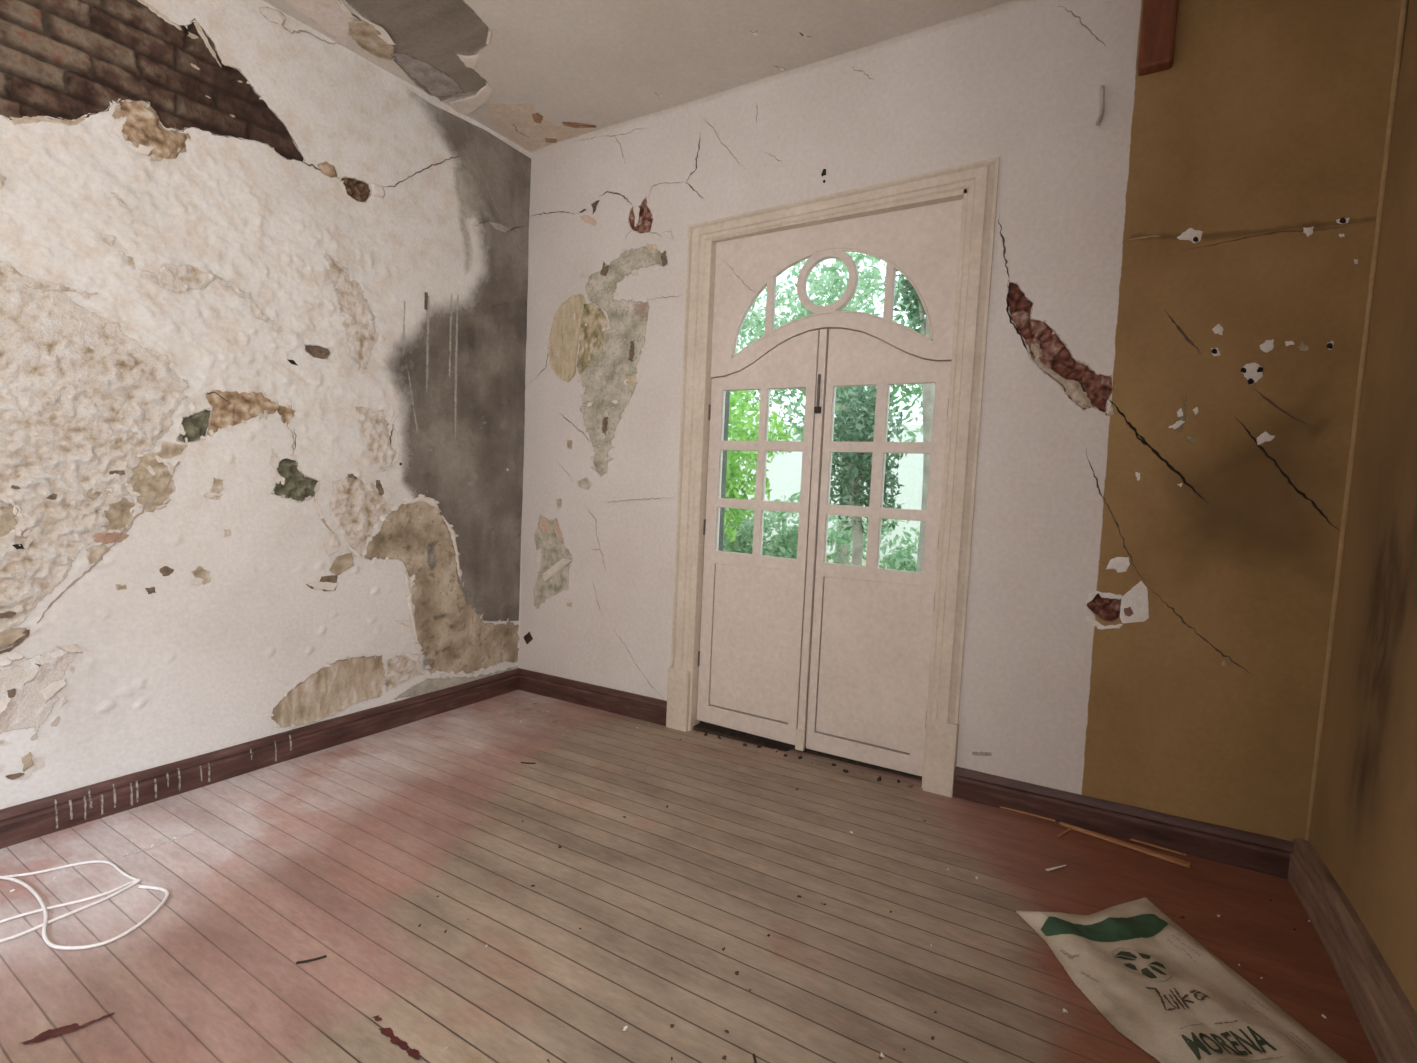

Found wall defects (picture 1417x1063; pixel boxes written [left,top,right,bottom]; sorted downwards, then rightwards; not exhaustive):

spalling [0,0,385,203]
peeling [259,0,599,153]
crack [382,103,782,240]
water stain [394,106,531,621]
peeling [548,196,670,490]
crack [998,220,1029,355]
spalling [1007,282,1115,416]
crack [1163,309,1200,353]
crack [1107,396,1211,505]
crack [1236,388,1338,529]
peeling [70,388,533,729]
spalling [1085,581,1149,630]